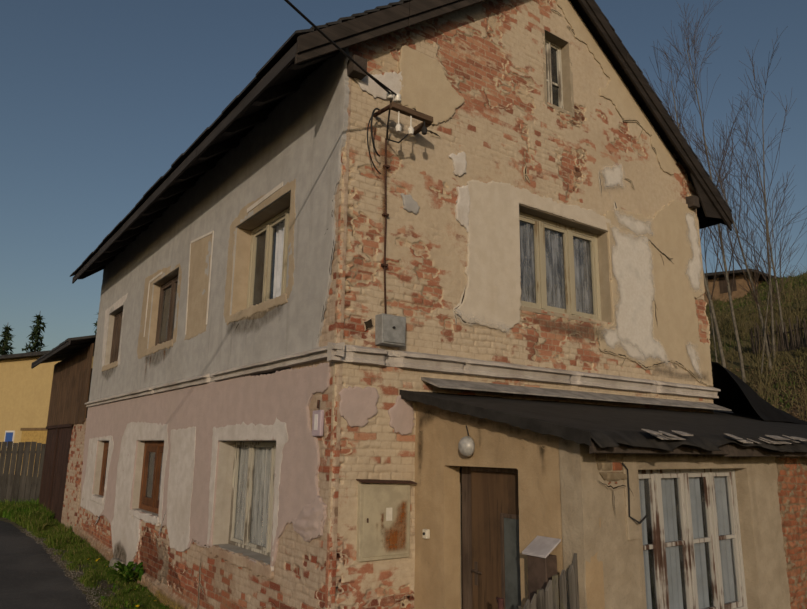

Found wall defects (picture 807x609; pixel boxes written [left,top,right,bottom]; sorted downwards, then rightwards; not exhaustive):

spalling [349,3,536,125]
crack [619,113,661,168]
peeling [429,152,470,232]
spalling [338,152,403,300]
crack [648,239,674,265]
spalling [520,312,597,361]
crack [596,327,713,387]
spalling [695,299,710,344]
peeling [388,390,414,435]
rust [382,502,406,550]
spalling [137,526,200,609]
spalling [285,537,414,609]